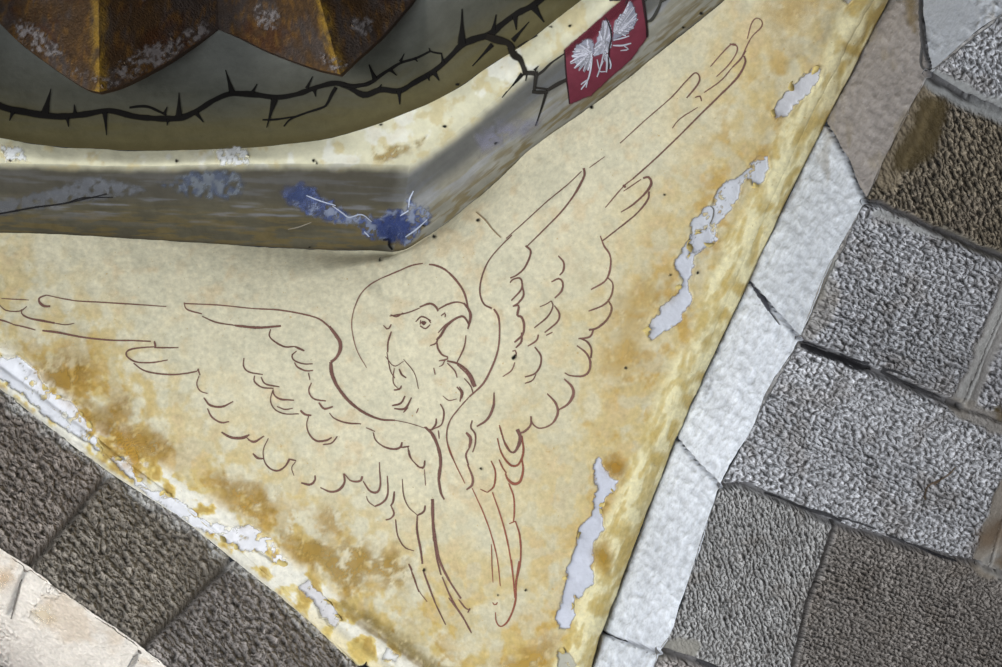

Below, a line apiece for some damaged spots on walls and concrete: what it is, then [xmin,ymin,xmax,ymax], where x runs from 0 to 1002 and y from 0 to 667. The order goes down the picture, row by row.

flaking render [770,65,820,117]
water stain [895,98,946,169]
flaking render [642,157,769,340]
flaking render [0,355,288,567]
flaking render [298,580,342,626]
flaking render [556,457,618,629]